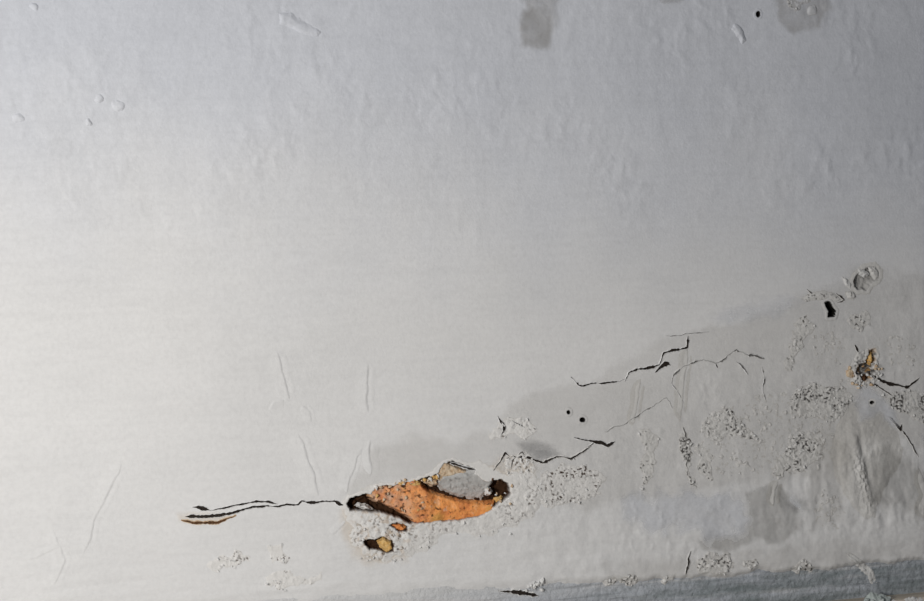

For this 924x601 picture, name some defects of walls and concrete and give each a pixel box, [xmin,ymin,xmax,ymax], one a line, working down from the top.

spalling [802,262,883,332]
peeling [488,416,537,440]
crack [493,331,766,471]
peeling [678,407,759,489]
peeling [771,431,825,480]
peeling [788,345,924,425]
crack [181,499,344,525]
spalling [341,451,607,564]